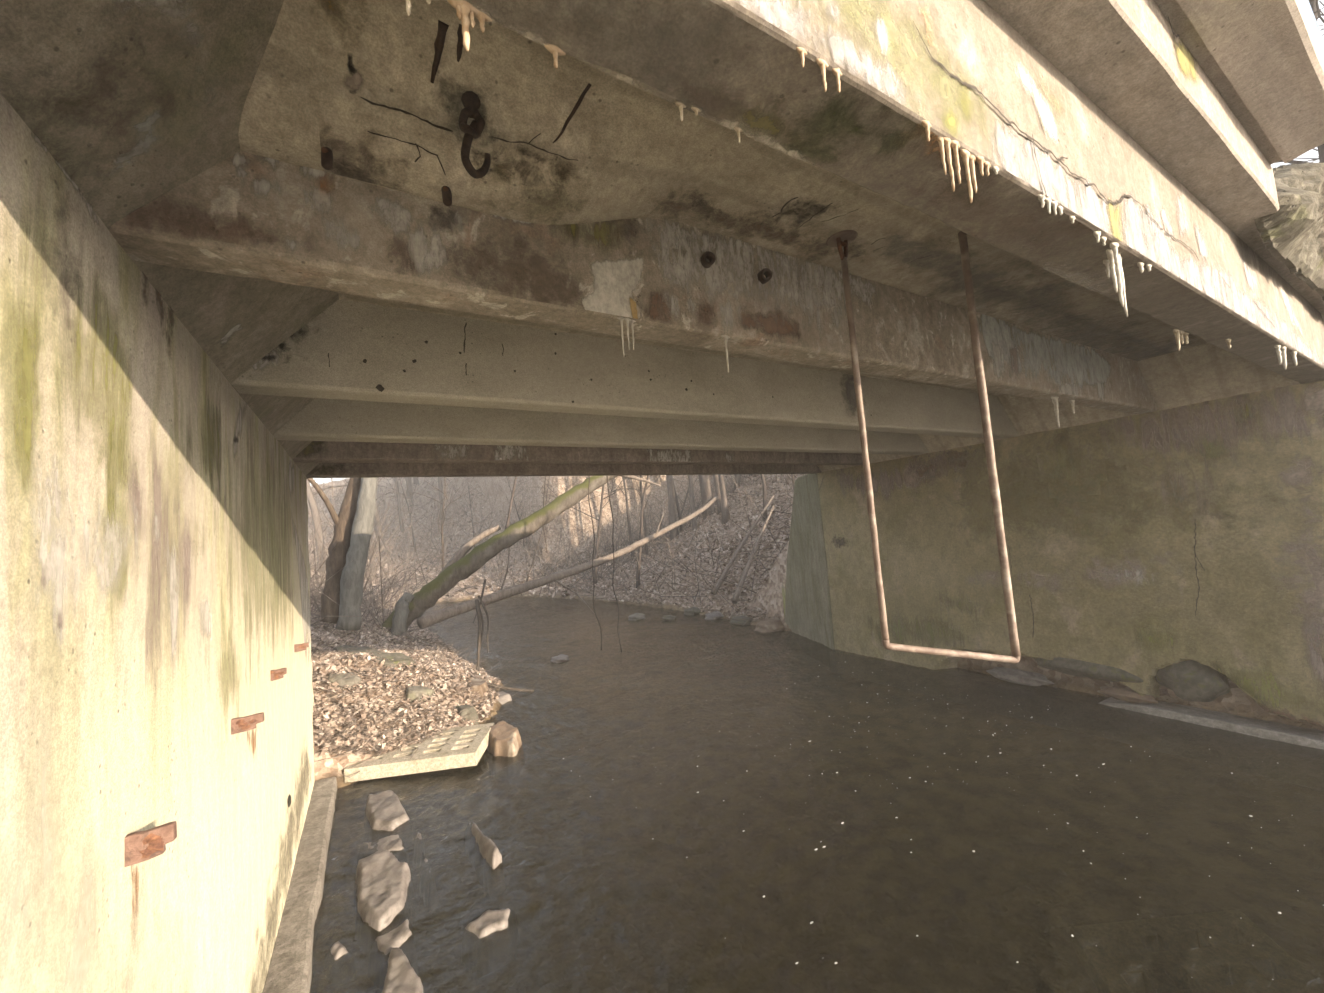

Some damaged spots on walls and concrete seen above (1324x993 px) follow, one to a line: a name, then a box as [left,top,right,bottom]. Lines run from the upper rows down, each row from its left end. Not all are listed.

crack [361,97,453,175]
crack [493,133,578,161]
damp [686,109,819,169]
crack [913,21,1275,327]
damp [14,322,37,485]
damp [39,472,68,636]
damp [105,443,211,656]
damp [293,524,310,661]
corrosion [236,719,258,753]
corrosion [131,833,164,913]